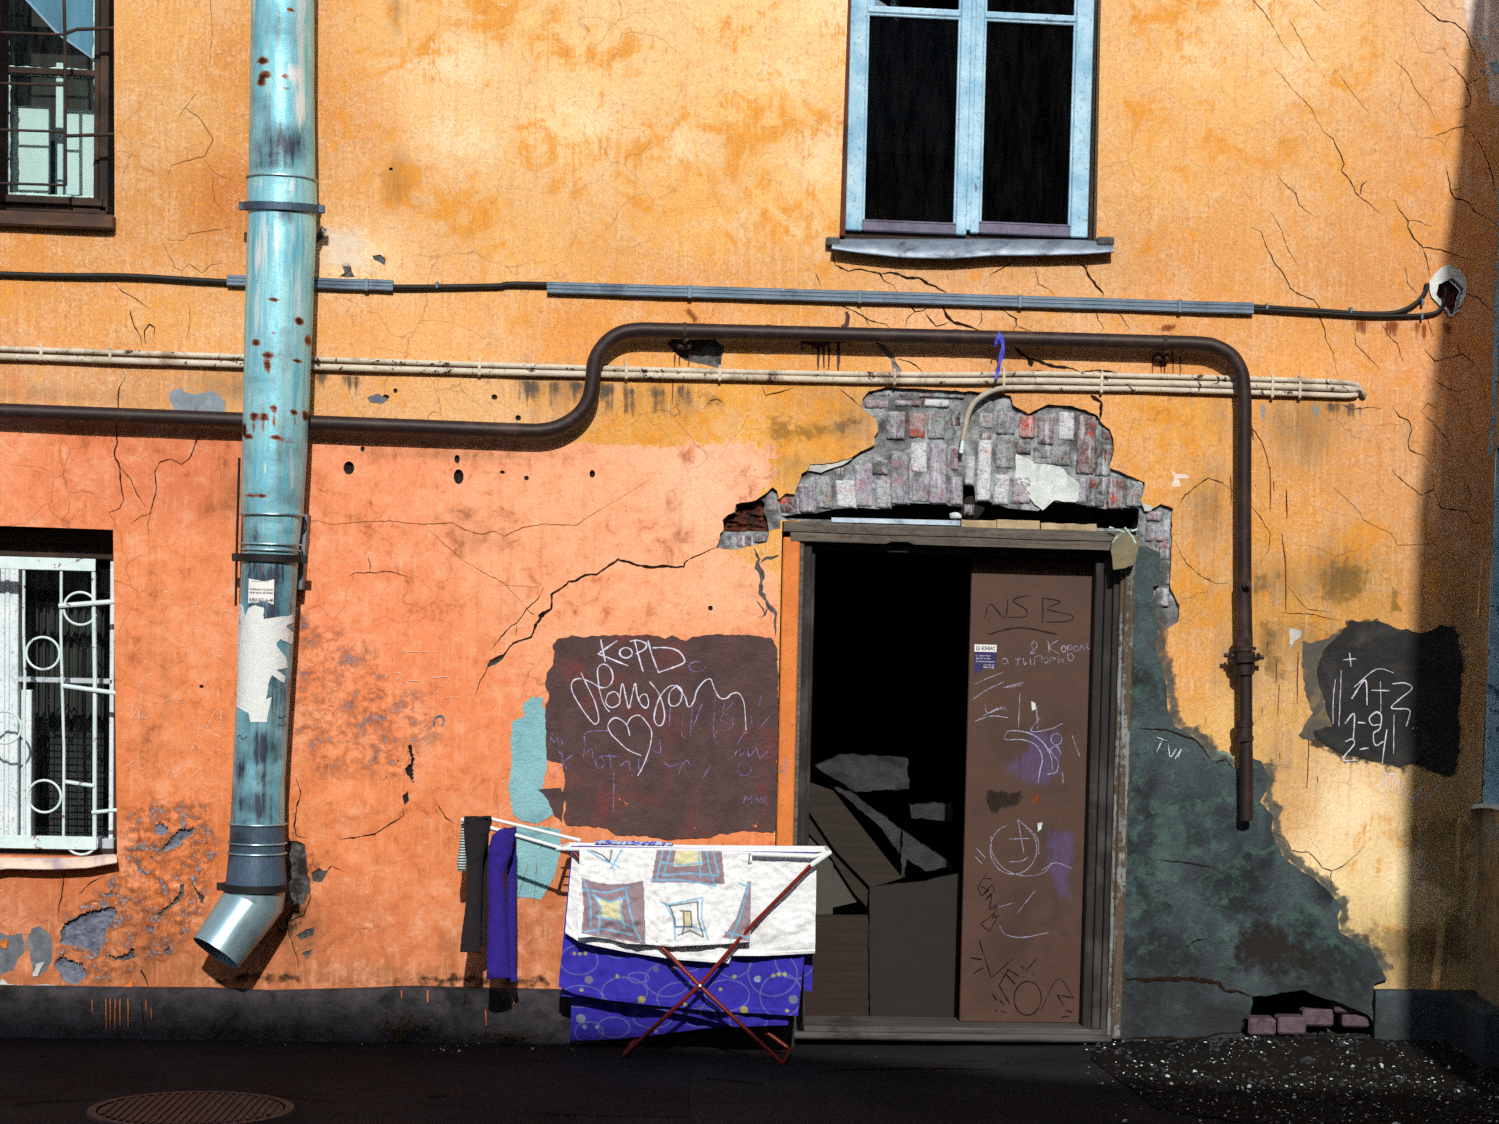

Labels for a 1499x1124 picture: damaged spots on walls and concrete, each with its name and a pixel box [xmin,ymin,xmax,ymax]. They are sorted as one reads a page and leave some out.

peeling [1464,0,1499,106]
crack [109,96,231,541]
crack [1253,0,1499,546]
spalling [1429,264,1467,317]
peeling [1488,190,1499,455]
flaking render [717,343,1180,629]
peeling [1171,470,1189,487]
crack [323,481,714,696]
crack [754,548,779,635]
peeling [1289,628,1301,650]
flaking render [0,890,135,985]
spalling [1241,990,1373,1038]